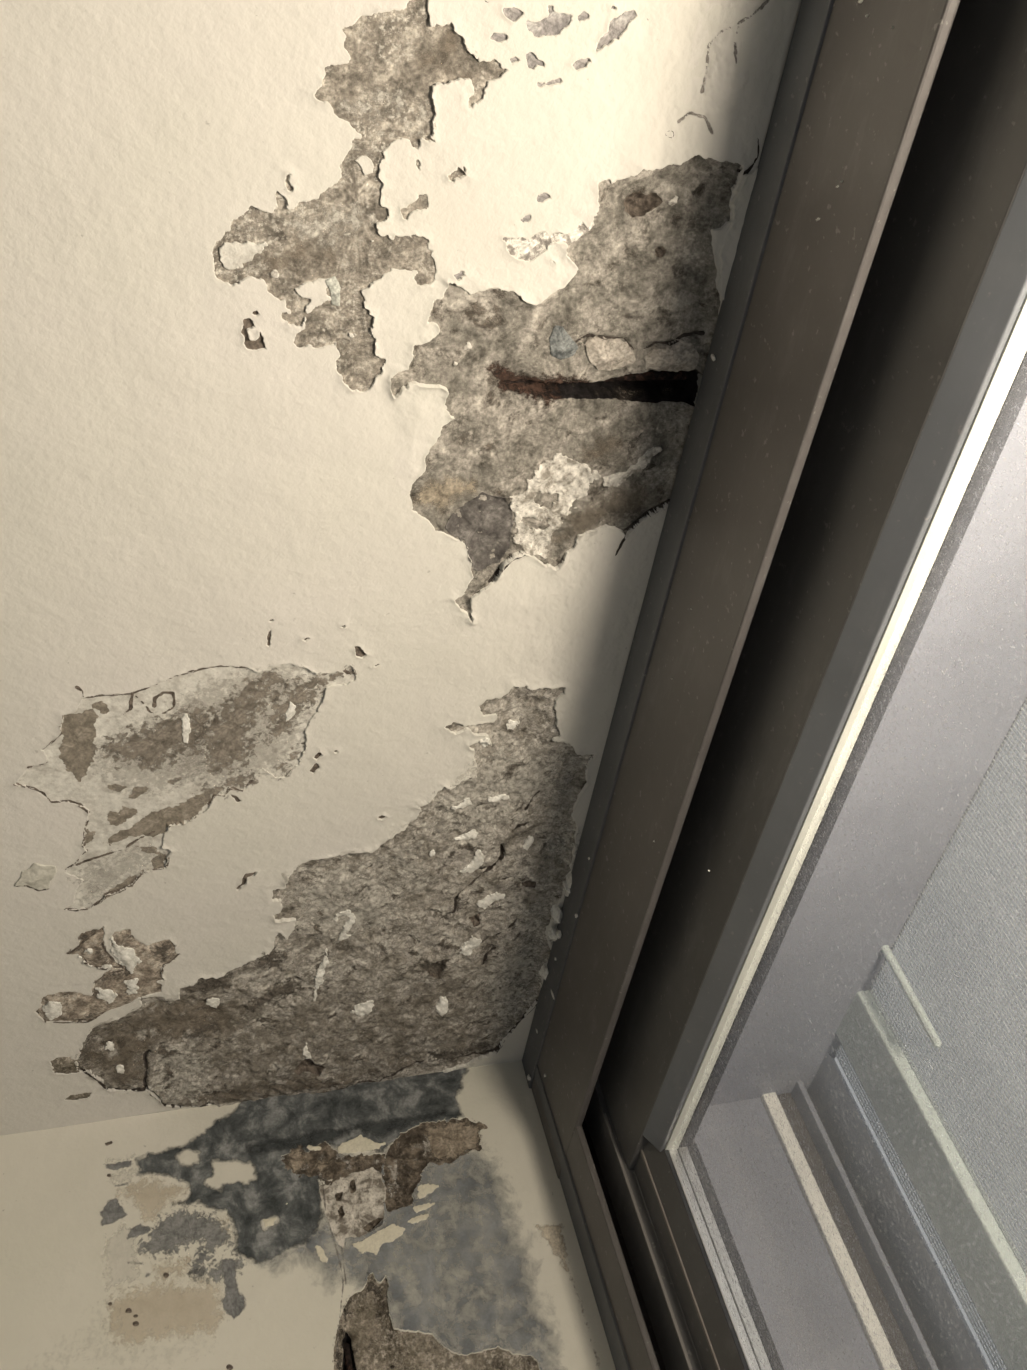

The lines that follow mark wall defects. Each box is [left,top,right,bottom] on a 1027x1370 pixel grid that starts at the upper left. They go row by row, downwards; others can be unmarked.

flaking render [212,0,760,618]
peeling [13,646,379,912]
flaking render [50,686,594,1108]
damp [100,1068,551,1370]
flaking render [282,1117,488,1263]
flaking render [333,1272,539,1370]
damp [536,1225,573,1280]